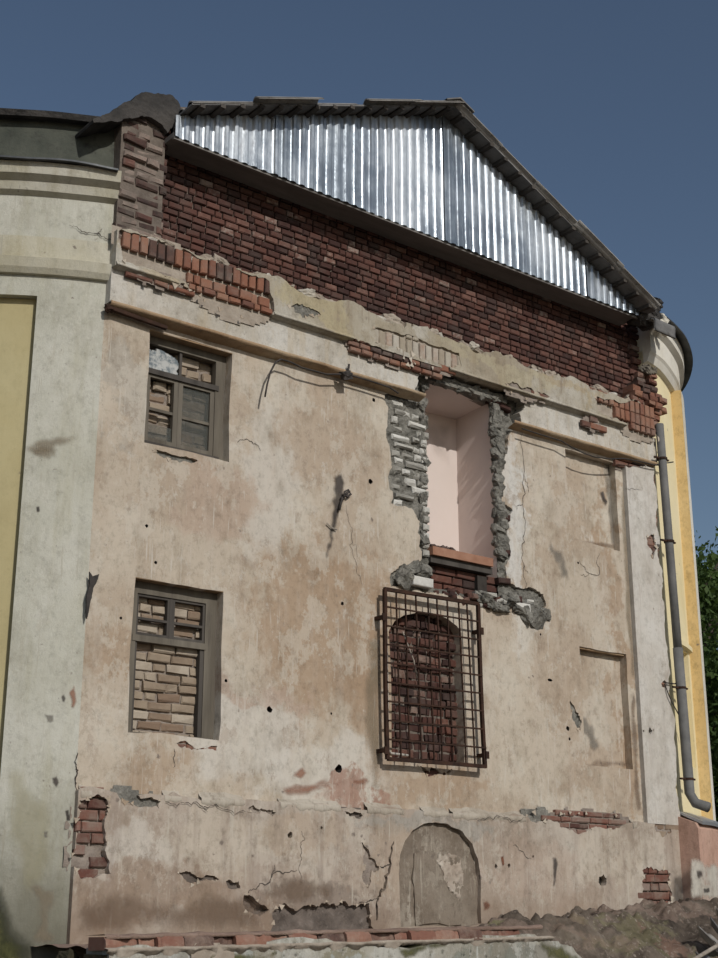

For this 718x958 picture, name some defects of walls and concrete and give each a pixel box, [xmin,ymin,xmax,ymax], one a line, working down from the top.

flaking render [111,225,272,327]
spalling [287,304,320,319]
flaking render [580,371,667,444]
spalling [343,322,552,636]
crack [517,435,529,590]
flaking render [62,785,160,879]
spalling [177,871,372,931]
crack [248,831,305,893]
flaking render [521,806,629,834]
flaking render [638,866,674,904]